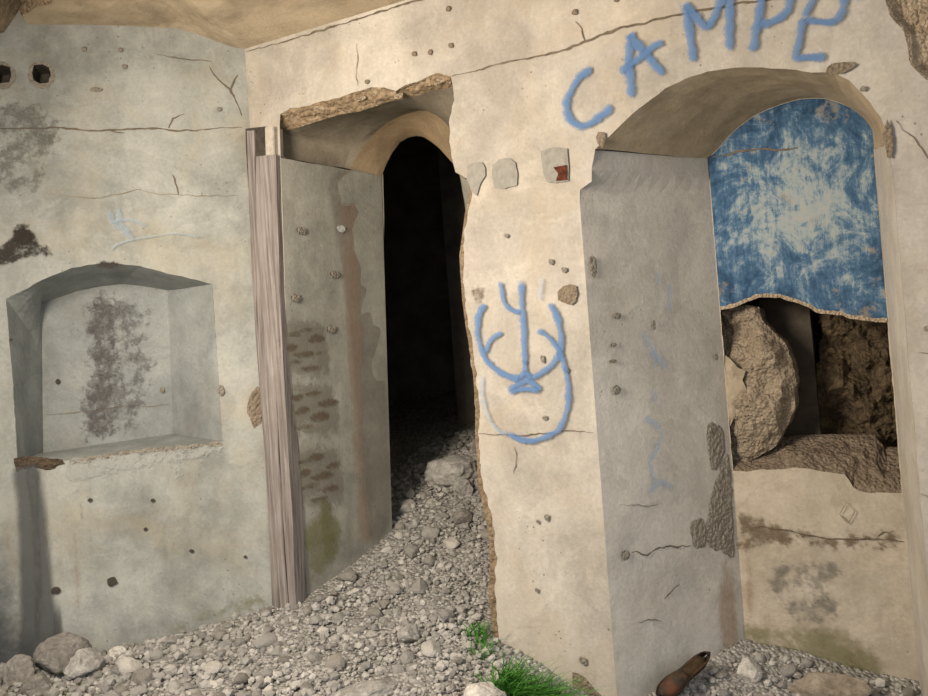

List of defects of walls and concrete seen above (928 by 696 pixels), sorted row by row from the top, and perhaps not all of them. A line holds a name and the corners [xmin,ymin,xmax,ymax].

crack [246,0,422,52]
crack [452,0,770,76]
spalling [885,0,928,80]
crack [0,55,242,133]
water stain [0,105,58,189]
water stain [82,298,148,437]
water stain [285,322,338,435]
spalling [690,293,902,558]
water stain [298,448,342,552]
crack [632,545,691,556]